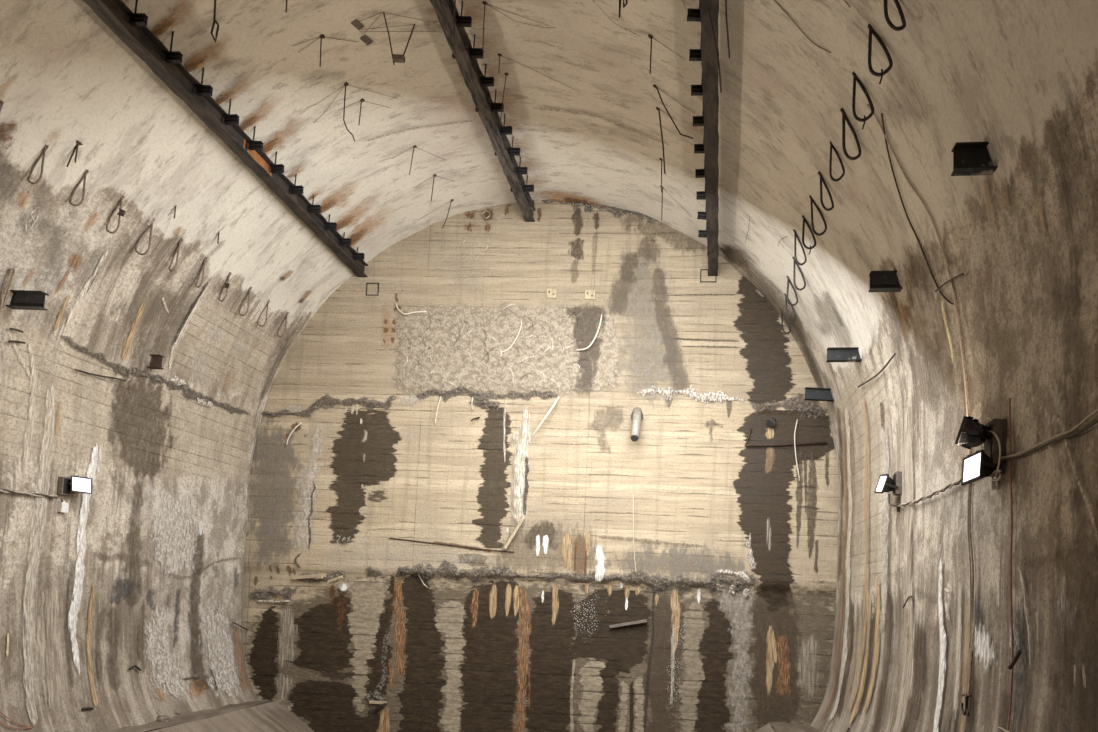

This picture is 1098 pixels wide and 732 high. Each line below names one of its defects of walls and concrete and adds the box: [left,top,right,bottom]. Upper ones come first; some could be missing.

rust [241,108,287,176]
rust [321,193,344,214]
rust [337,210,373,246]
leakage [97,281,194,478]
spalling [392,301,622,410]
leakage [246,246,836,732]